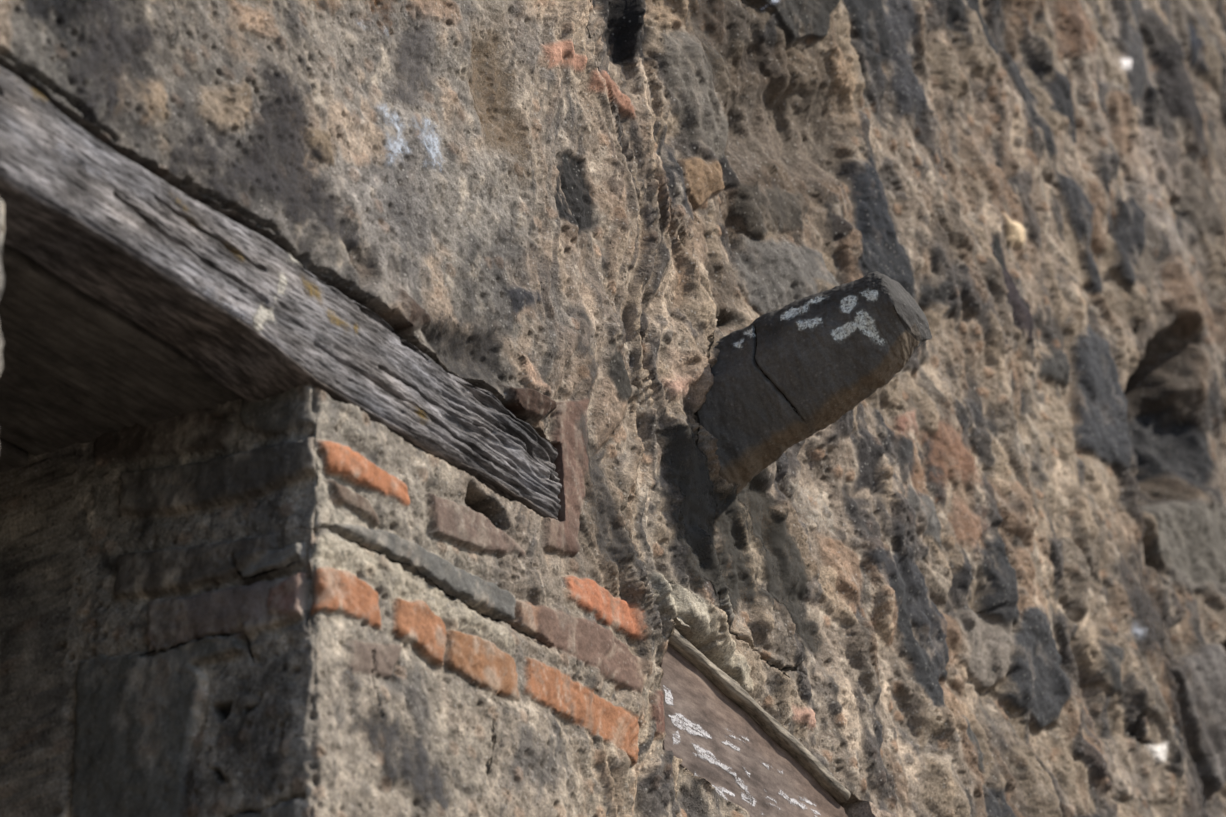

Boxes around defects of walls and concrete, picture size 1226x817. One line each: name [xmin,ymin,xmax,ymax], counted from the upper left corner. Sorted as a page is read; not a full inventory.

crack [754,327,799,415]